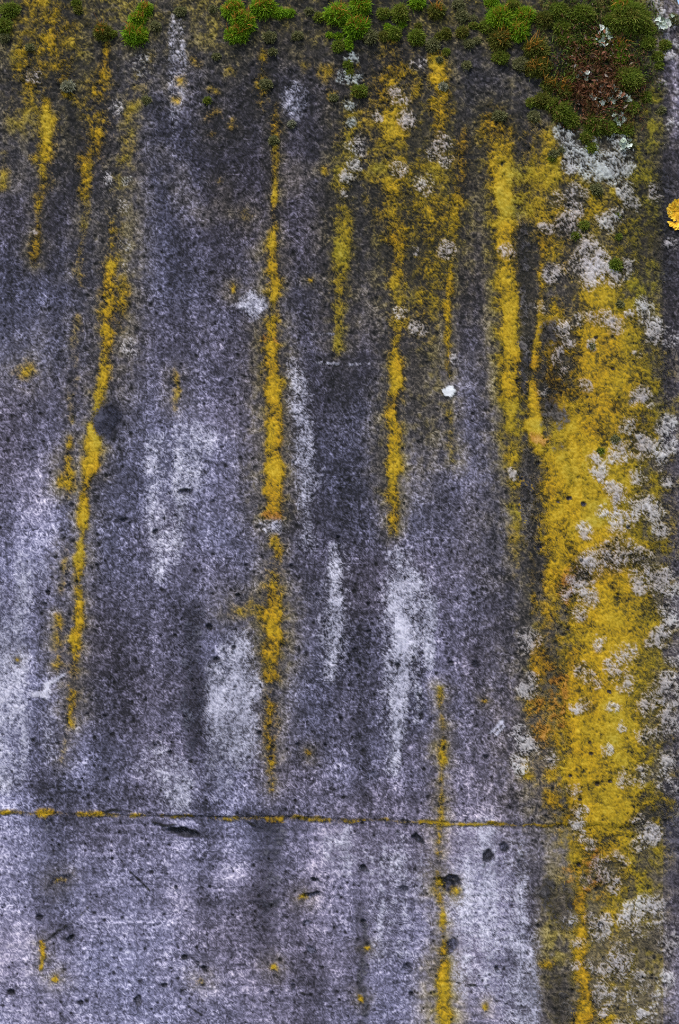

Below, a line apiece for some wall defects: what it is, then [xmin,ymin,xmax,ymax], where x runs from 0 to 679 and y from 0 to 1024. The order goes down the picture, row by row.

water stain [0,554,33,795]
water stain [52,244,131,671]
water stain [146,428,214,580]
water stain [154,572,283,812]
water stain [238,226,315,557]
water stain [321,543,343,681]
water stain [384,231,406,532]
water stain [382,549,438,775]
water stain [479,113,559,557]
crack [0,808,389,827]
water stain [434,819,595,1024]
crack [419,820,661,828]